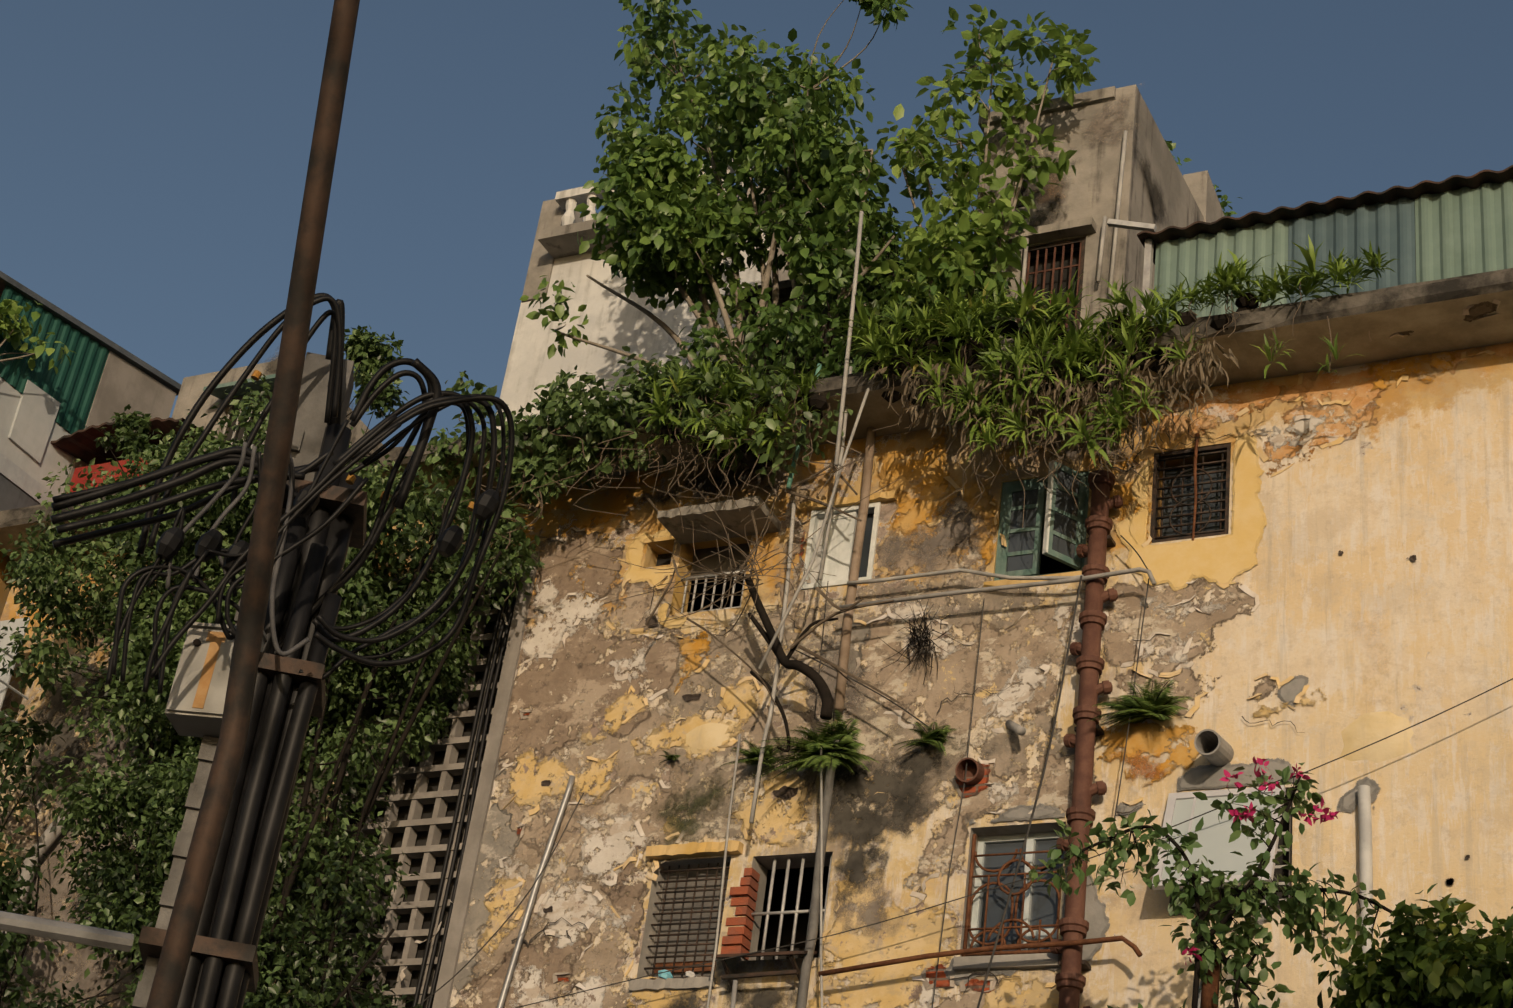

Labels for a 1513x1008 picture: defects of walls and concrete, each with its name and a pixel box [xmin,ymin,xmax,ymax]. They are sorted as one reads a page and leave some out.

damp [1023,155,1067,227]
damp [1136,150,1166,222]
flaking render [1100,578,1260,719]
flaking render [1247,672,1310,710]
flaking render [449,476,1085,1008]
damp [828,748,946,932]
flaking render [1117,797,1144,817]